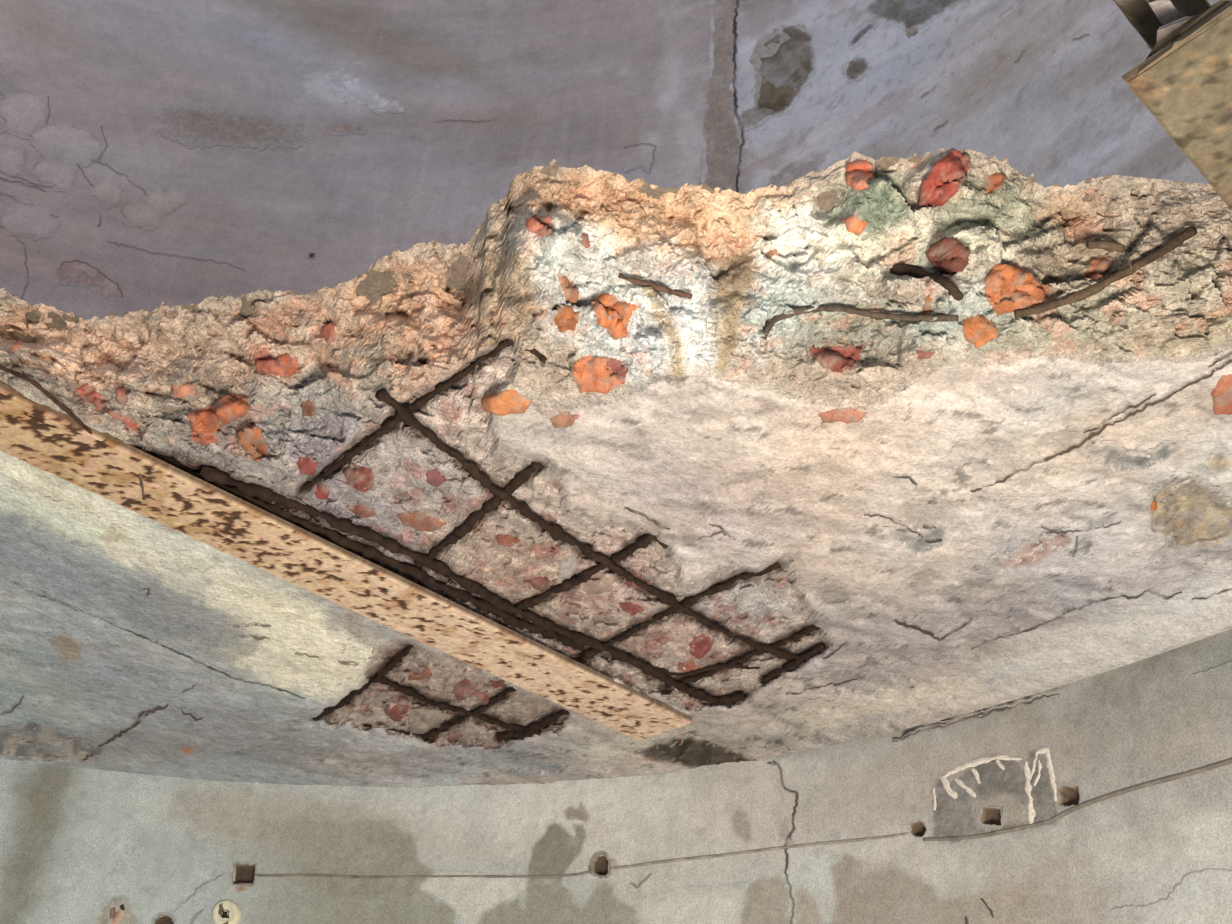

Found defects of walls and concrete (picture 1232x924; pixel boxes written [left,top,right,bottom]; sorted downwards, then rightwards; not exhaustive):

spalling [0,0,1232,712]
crack [970,350,1232,492]
leakage [0,756,89,924]
crack [0,575,306,763]
leakage [156,780,459,924]
spalling [312,639,568,782]
leakage [483,798,638,924]
spalling [632,732,760,770]
crack [767,760,800,924]
leakage [743,849,1193,924]
flaking render [908,746,1084,844]
crack [895,587,1232,650]